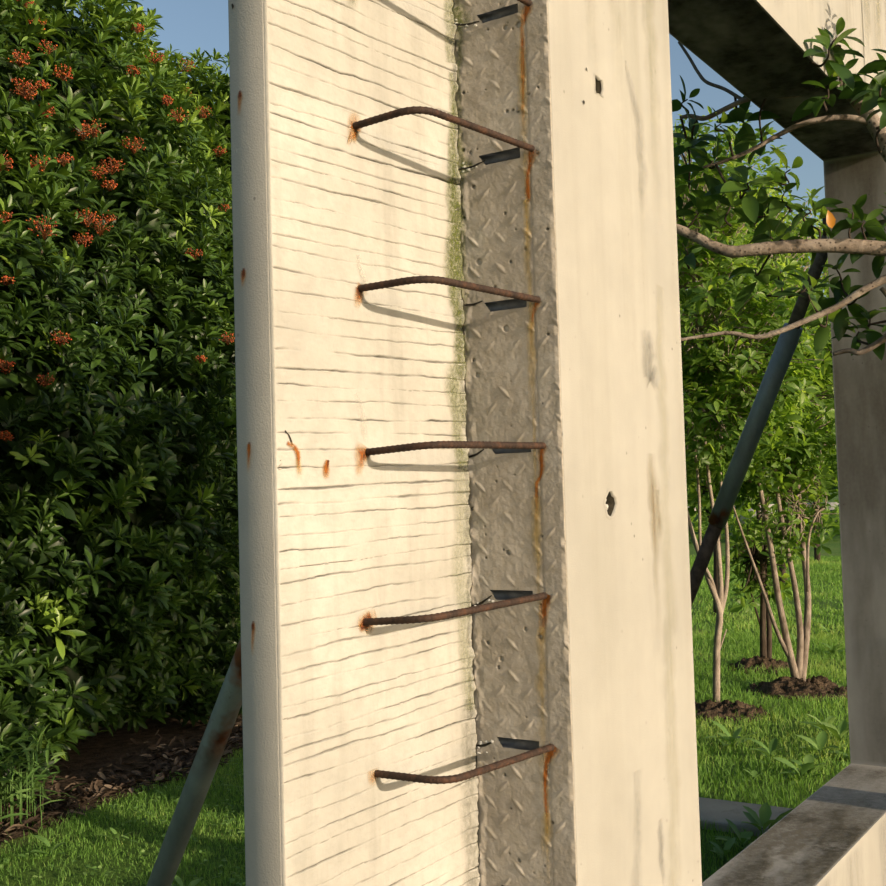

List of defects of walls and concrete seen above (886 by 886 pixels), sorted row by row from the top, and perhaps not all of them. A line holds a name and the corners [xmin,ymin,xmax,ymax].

crack [453,0,480,64]
rust [520,4,533,110]
crack [458,160,485,218]
rust [525,149,538,240]
rust [285,430,300,467]
crack [462,296,484,517]
rust [535,448,545,531]
crack [471,581,492,687]
rust [541,594,551,630]
crack [475,718,491,824]
rust [543,746,558,834]
leakage [723,802,877,886]